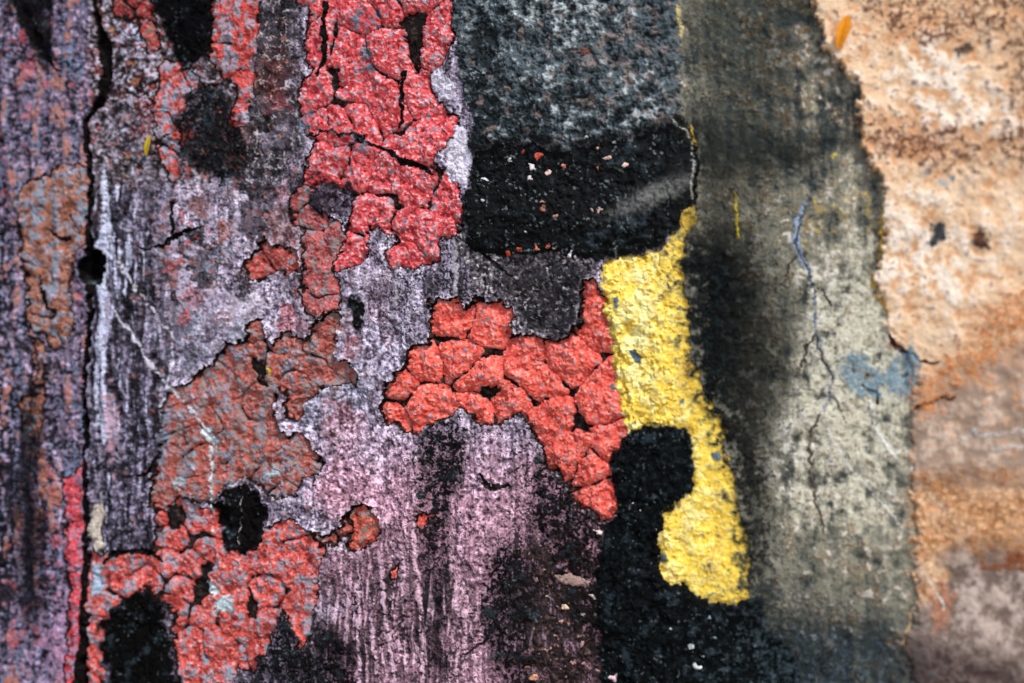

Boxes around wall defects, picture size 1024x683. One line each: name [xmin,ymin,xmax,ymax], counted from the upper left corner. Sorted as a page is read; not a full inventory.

crack [39,273,58,314]
crack [47,0,113,254]
crack [71,283,164,683]
peeling [61,0,489,683]
peeling [377,277,636,535]
peeling [507,150,566,180]
crack [785,172,847,534]